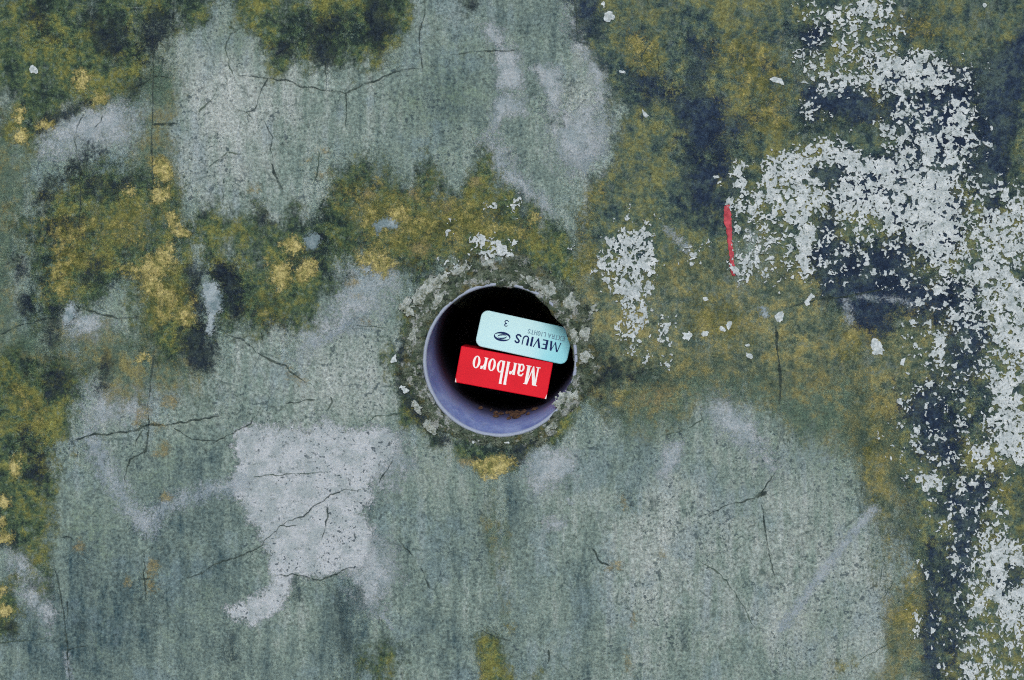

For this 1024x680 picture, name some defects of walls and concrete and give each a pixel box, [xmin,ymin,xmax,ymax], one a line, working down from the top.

damp [34,74,151,162]
crack [199,1,425,187]
damp [541,3,615,182]
damp [49,309,116,346]
damp [290,256,399,364]
peeling [590,200,732,371]
peeling [713,0,1024,680]
crack [76,349,252,480]
crack [186,489,346,578]
crack [283,567,357,581]